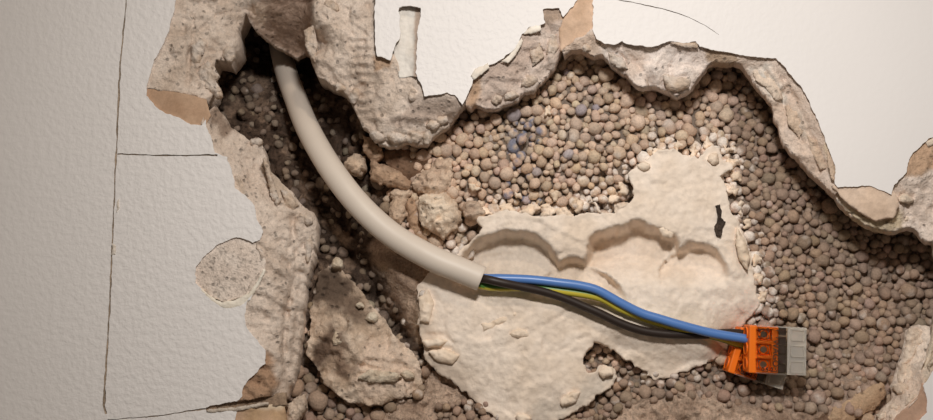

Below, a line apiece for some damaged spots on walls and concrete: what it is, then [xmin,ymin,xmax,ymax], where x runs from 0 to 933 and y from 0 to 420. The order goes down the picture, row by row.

crack [103,0,288,420]
flaking render [147,0,467,402]
crack [620,0,719,35]
flaking render [466,0,933,258]
flaking render [599,366,614,379]
flaking render [873,316,933,420]